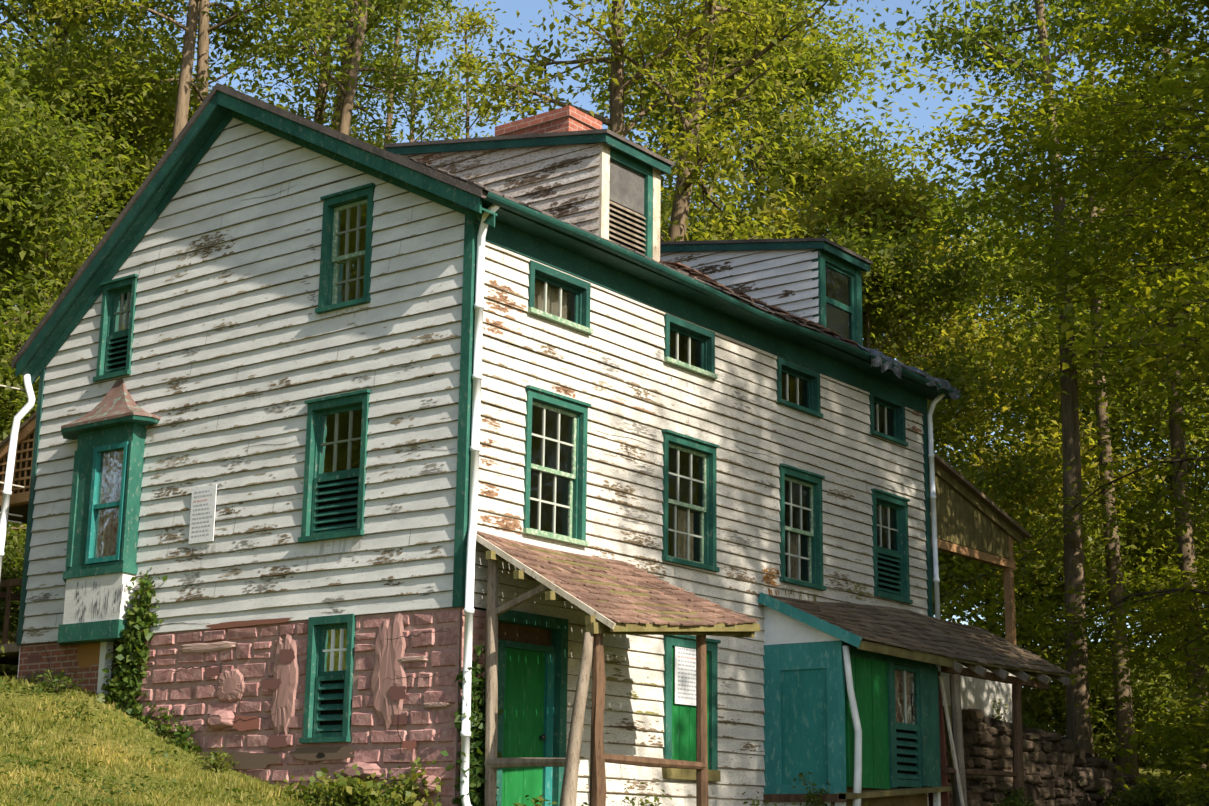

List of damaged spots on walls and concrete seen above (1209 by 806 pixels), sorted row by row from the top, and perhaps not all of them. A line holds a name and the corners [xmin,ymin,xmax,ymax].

peeling [504,156,587,227]
peeling [165,230,235,308]
peeling [669,254,759,292]
peeling [483,280,527,335]
peeling [481,417,501,466]
peeling [480,483,499,498]
peeling [480,515,522,535]
peeling [592,418,669,578]
peeling [156,527,212,601]
peeling [220,524,298,594]
peeling [369,548,407,596]
peeling [718,531,781,594]